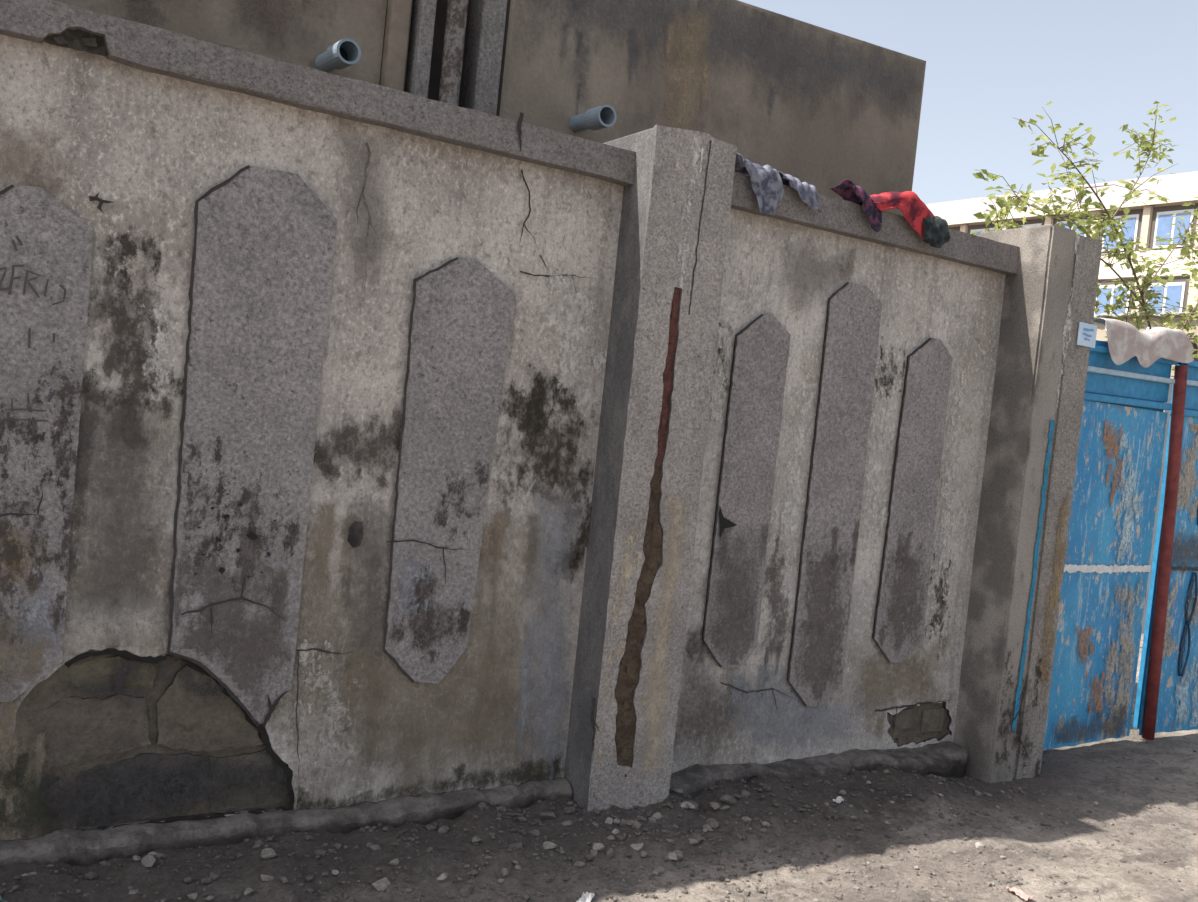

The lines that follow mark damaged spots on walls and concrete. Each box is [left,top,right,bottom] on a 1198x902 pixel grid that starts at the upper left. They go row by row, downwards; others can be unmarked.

spalling [44,29,108,57]
crack [517,112,596,302]
water stain [540,0,915,288]
crack [0,491,51,523]
flaking render [5,608,364,838]
crack [181,574,357,795]
water stain [0,233,594,780]
crack [386,539,474,583]
crack [648,348,676,560]
flaking render [887,701,950,746]
peeling [1101,431,1144,738]
peeling [1162,582,1198,727]